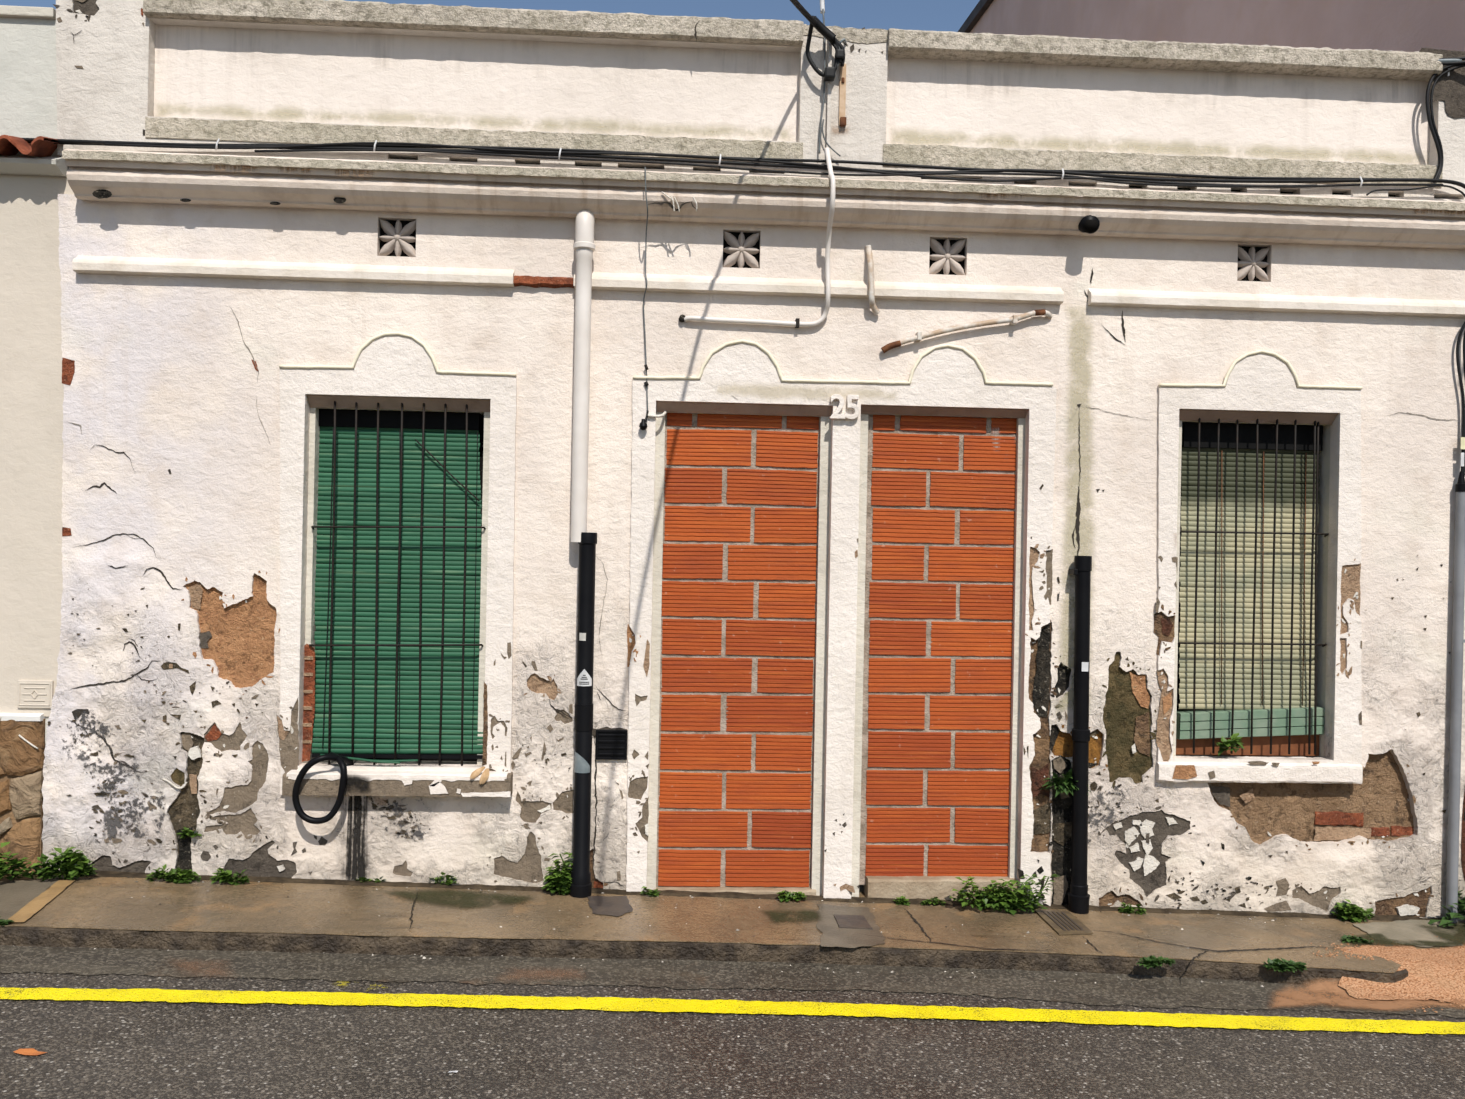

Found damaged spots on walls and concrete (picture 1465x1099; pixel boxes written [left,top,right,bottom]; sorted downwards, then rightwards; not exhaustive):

crack [231,308,271,445]
crack [69,422,135,494]
crack [75,533,180,590]
spalling [112,571,327,878]
peeling [482,642,574,883]
spalling [1017,537,1425,912]
peeling [88,852,151,873]
peeling [1369,884,1435,917]